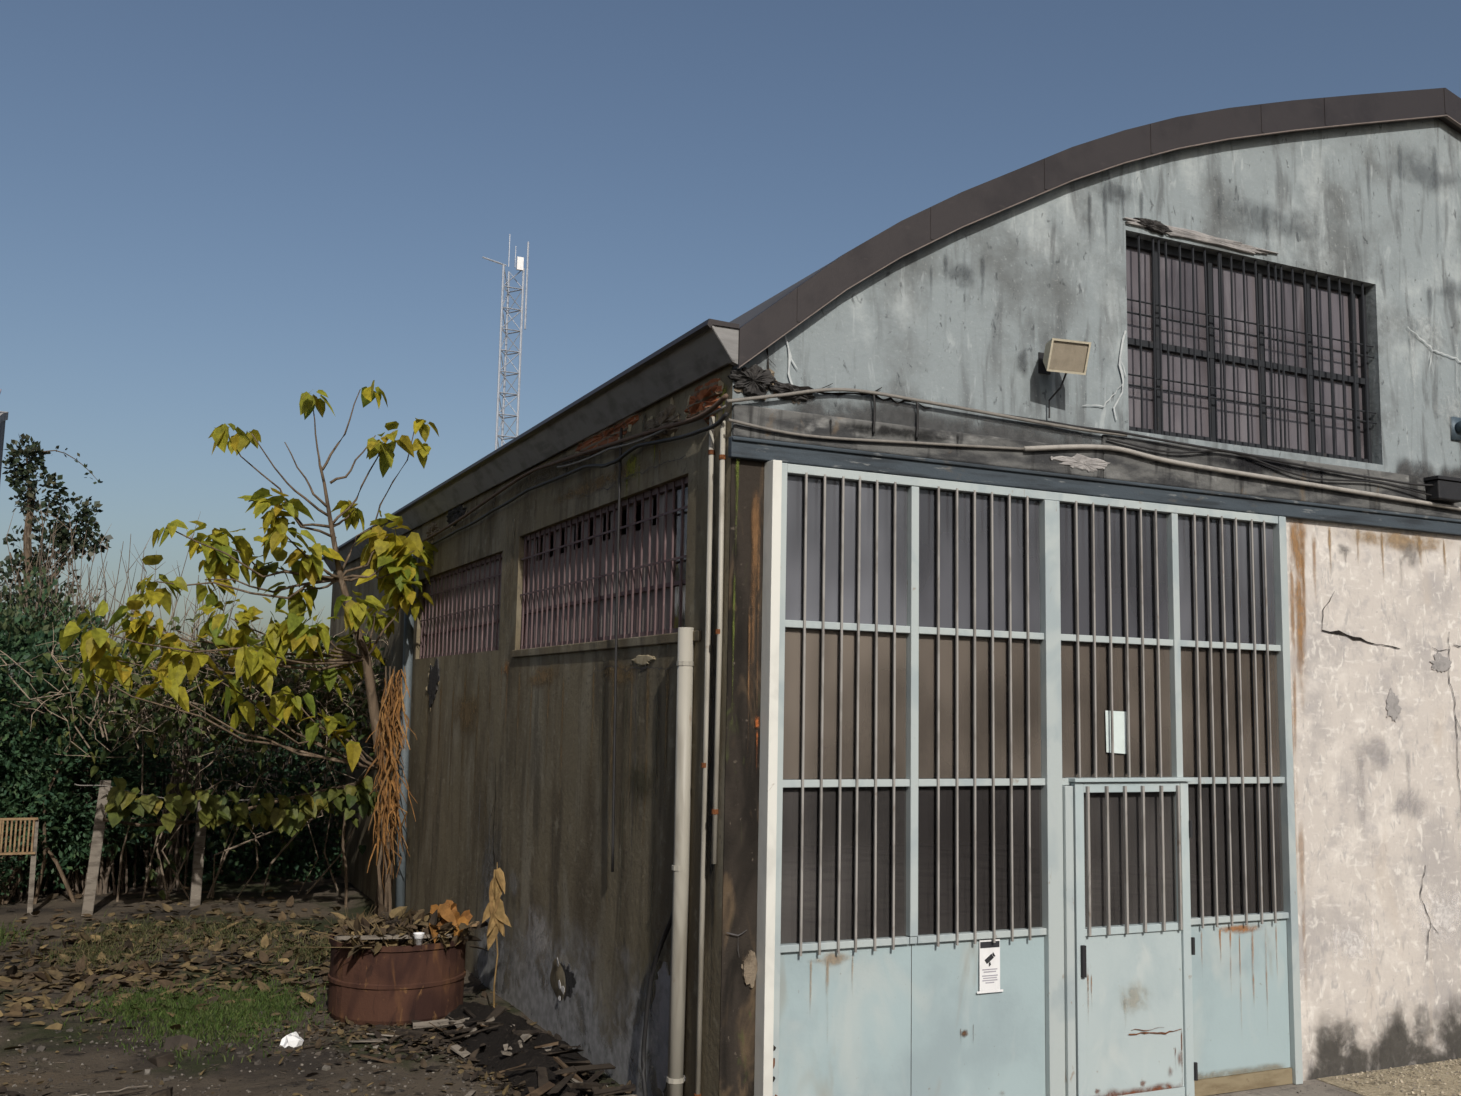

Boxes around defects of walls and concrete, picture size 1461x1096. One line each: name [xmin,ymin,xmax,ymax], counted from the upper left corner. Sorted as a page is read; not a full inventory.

damp [796,401,1103,445]
damp [1219,457,1327,483]
crack [1322,591,1461,793]
crack [1420,865,1440,959]
corrosion [1219,925,1267,983]
damp [1308,1013,1461,1080]